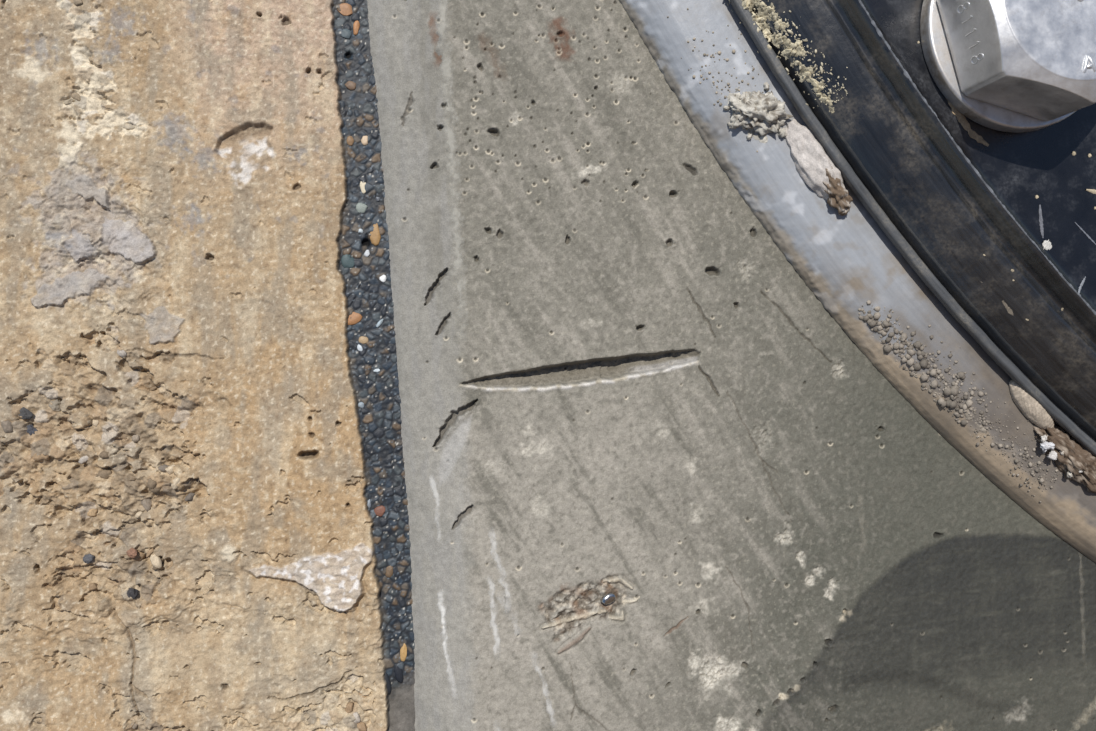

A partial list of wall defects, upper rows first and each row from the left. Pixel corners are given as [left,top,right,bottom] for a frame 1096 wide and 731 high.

spalling [0,0,214,615]
spalling [534,571,638,655]
leakage [898,536,1096,615]
crack [113,608,150,717]
leakage [1001,695,1041,726]
leakage [1064,695,1096,731]